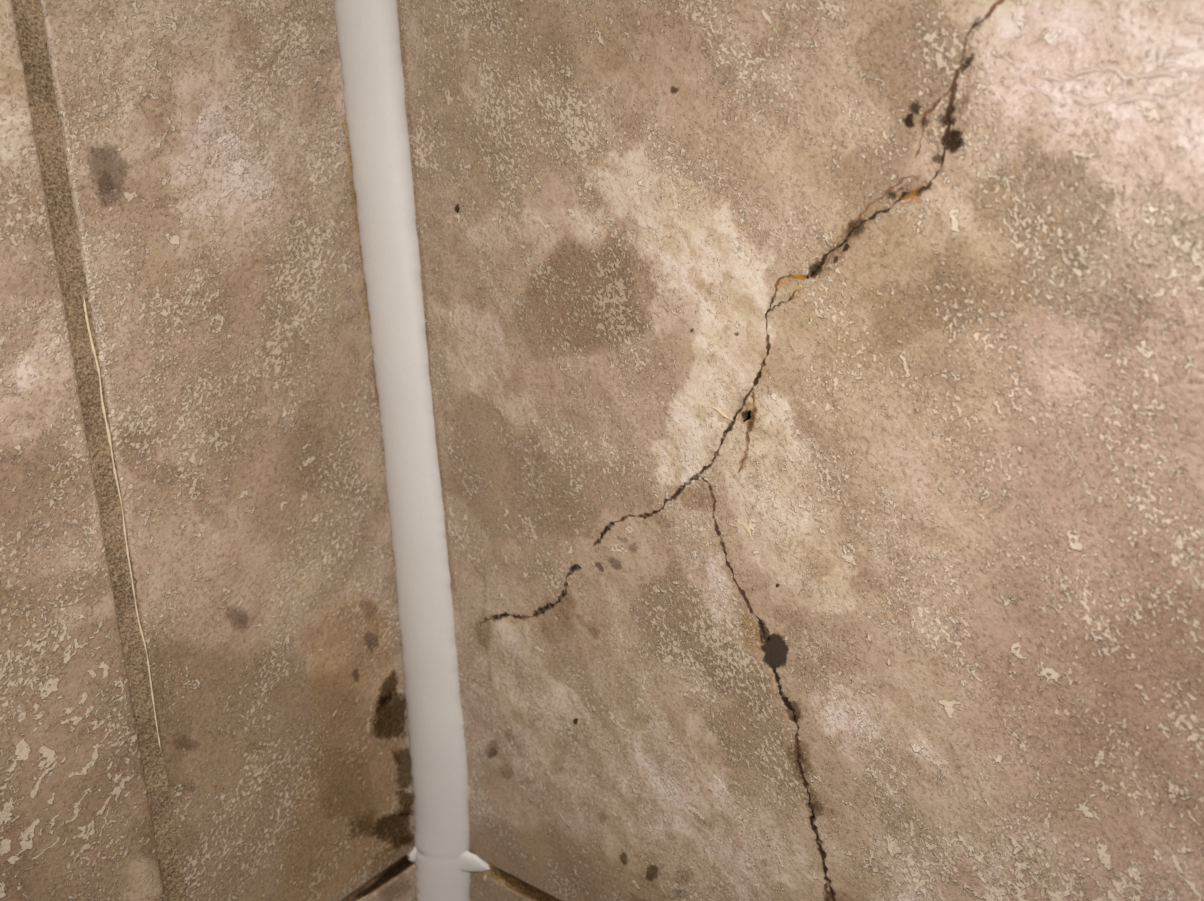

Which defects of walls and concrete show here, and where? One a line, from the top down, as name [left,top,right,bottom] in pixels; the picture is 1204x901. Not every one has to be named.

crack [480,0,1004,901]
damp [372,672,406,739]
damp [359,791,415,896]